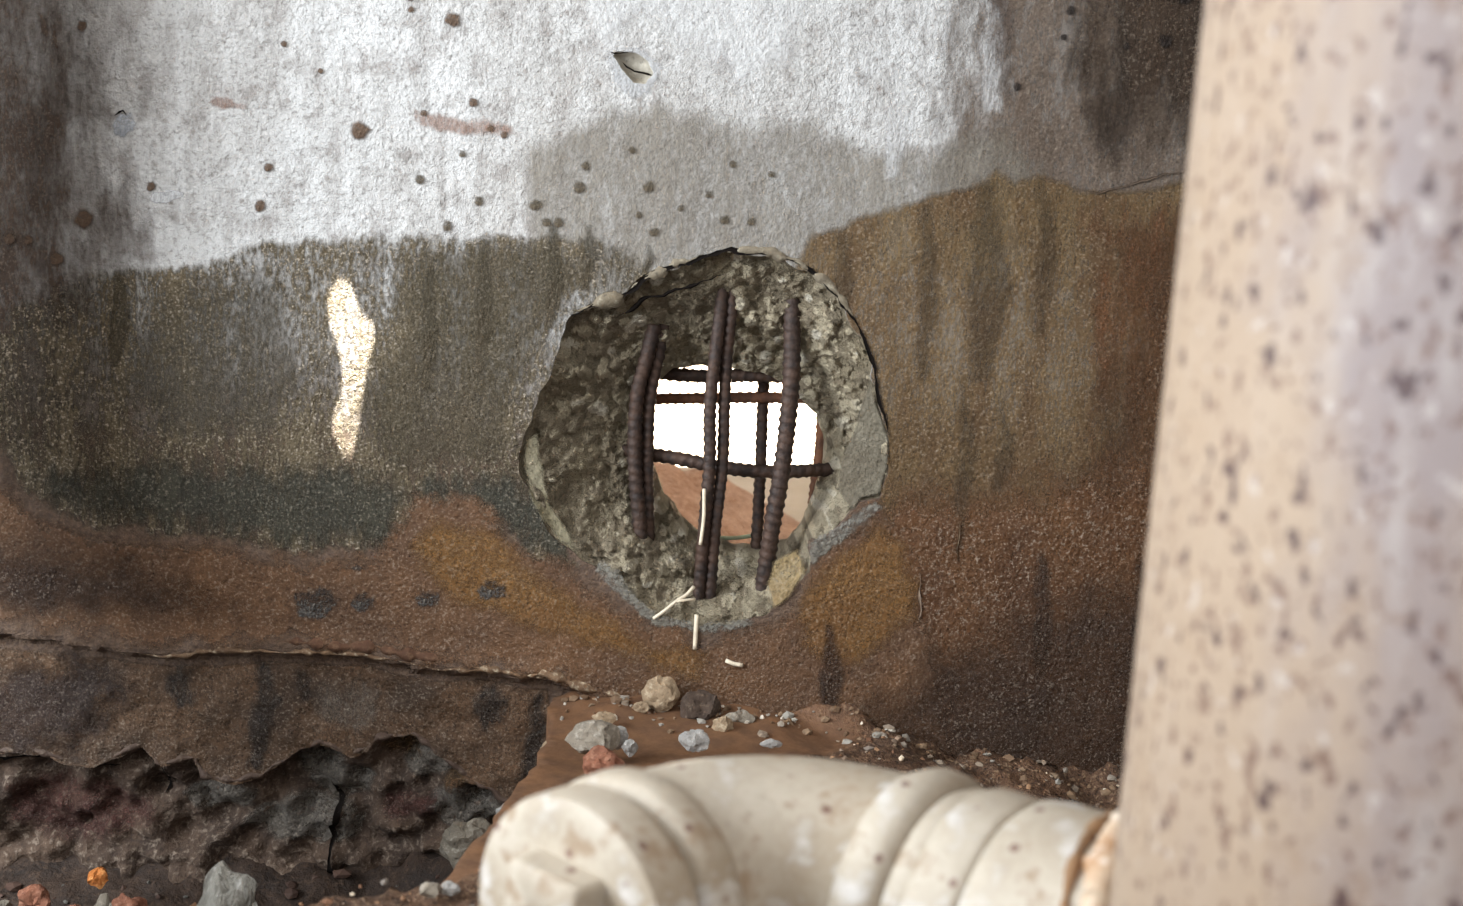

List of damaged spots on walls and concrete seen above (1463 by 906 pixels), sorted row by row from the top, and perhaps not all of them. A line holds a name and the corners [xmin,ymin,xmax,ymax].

corrosion [420,98,509,157]
corrosion [529,200,563,228]
corrosion [574,161,589,194]
leakage [0,0,1204,566]
spalling [519,246,890,632]
leakage [0,648,549,798]
spalling [0,732,509,884]